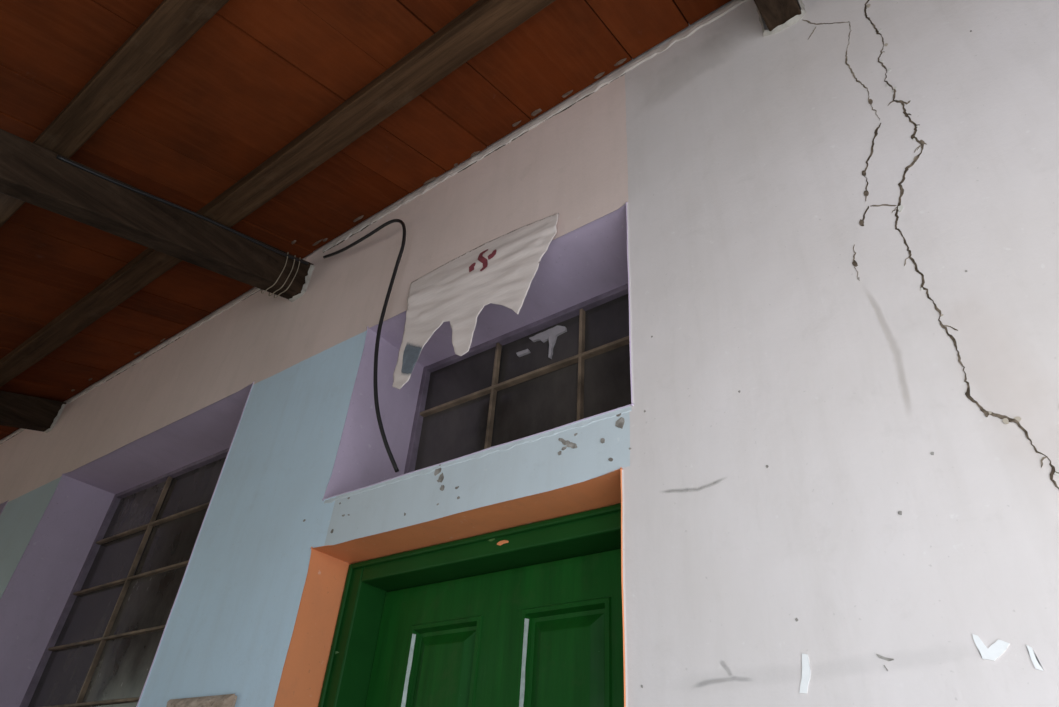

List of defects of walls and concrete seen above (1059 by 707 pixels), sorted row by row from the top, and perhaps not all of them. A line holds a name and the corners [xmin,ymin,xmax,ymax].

crack [802,0,1059,489]